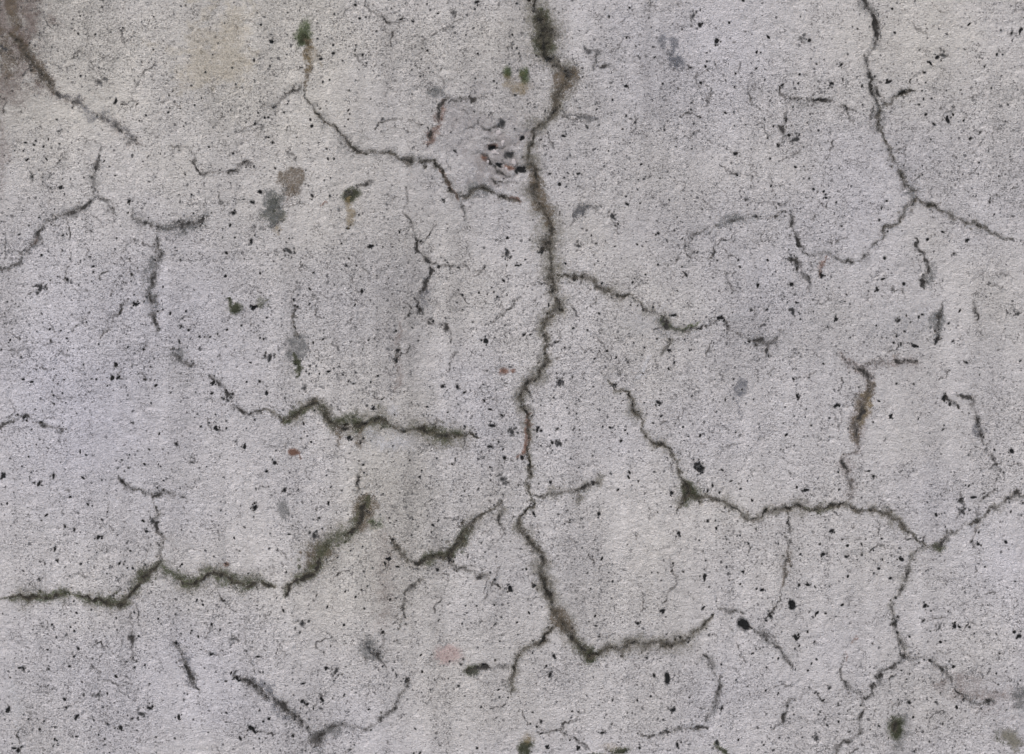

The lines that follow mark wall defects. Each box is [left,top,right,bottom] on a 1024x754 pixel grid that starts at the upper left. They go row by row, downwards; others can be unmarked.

crack [0,1,477,461]
crack [273,0,1022,754]
crack [4,475,380,663]
crack [175,624,213,690]
crack [234,635,410,752]